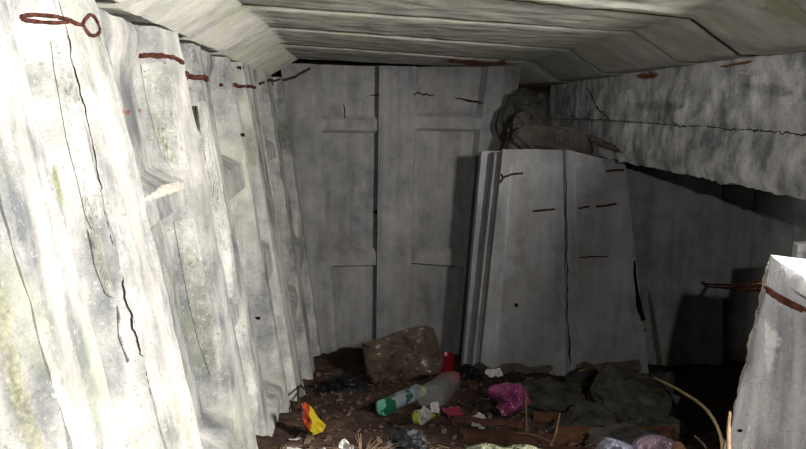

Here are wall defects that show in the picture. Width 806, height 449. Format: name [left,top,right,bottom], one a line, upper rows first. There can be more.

crack [58,0,103,192]
spalling [585,135,625,154]
crack [556,85,806,136]
crack [122,278,151,395]